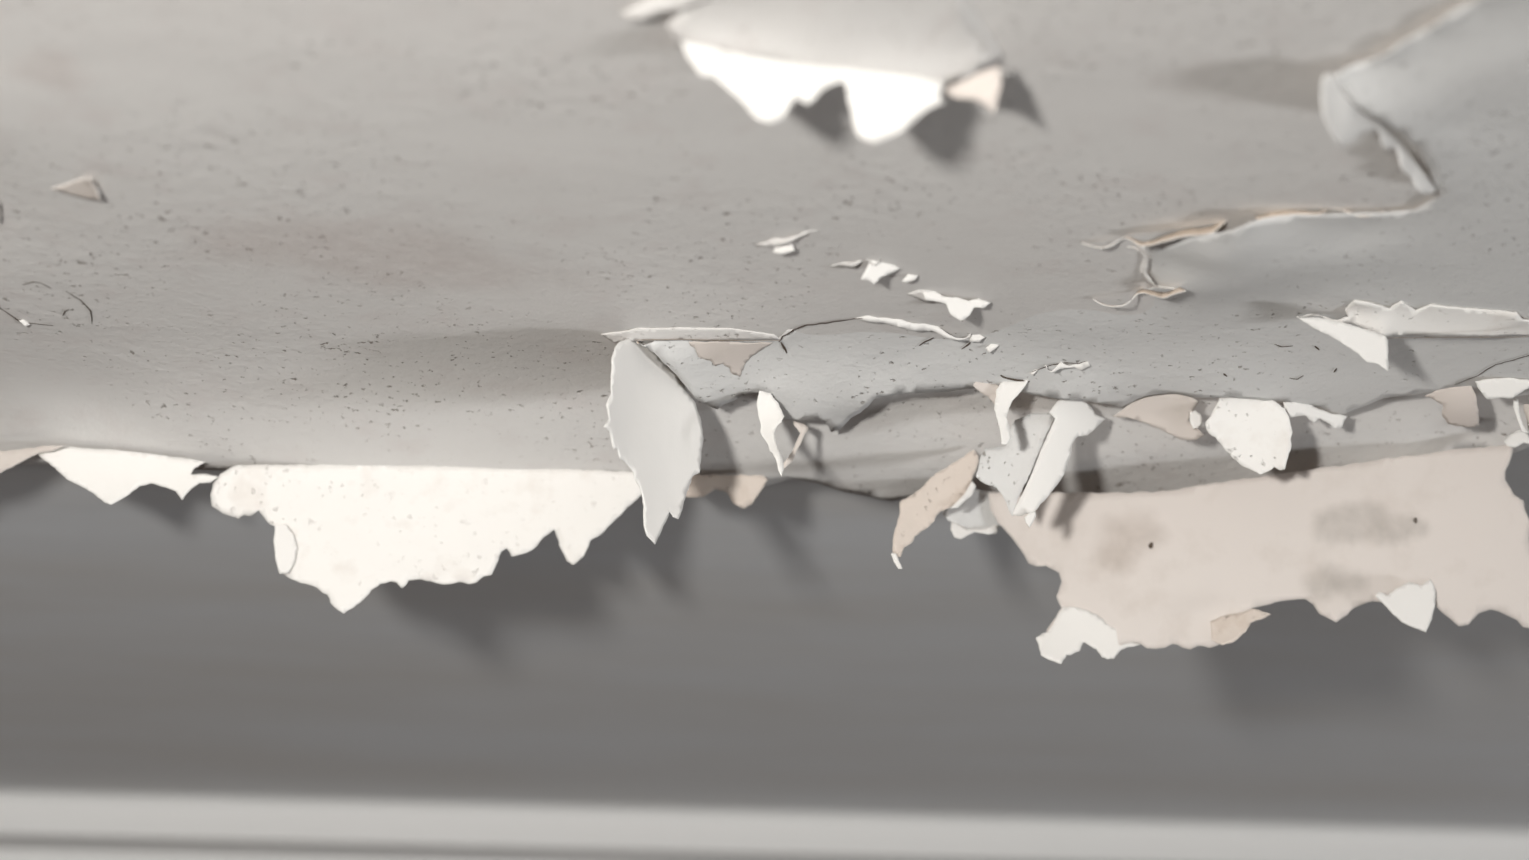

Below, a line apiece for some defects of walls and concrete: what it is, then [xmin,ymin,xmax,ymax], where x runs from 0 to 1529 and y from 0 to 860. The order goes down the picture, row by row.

peeling [0,0,1529,664]